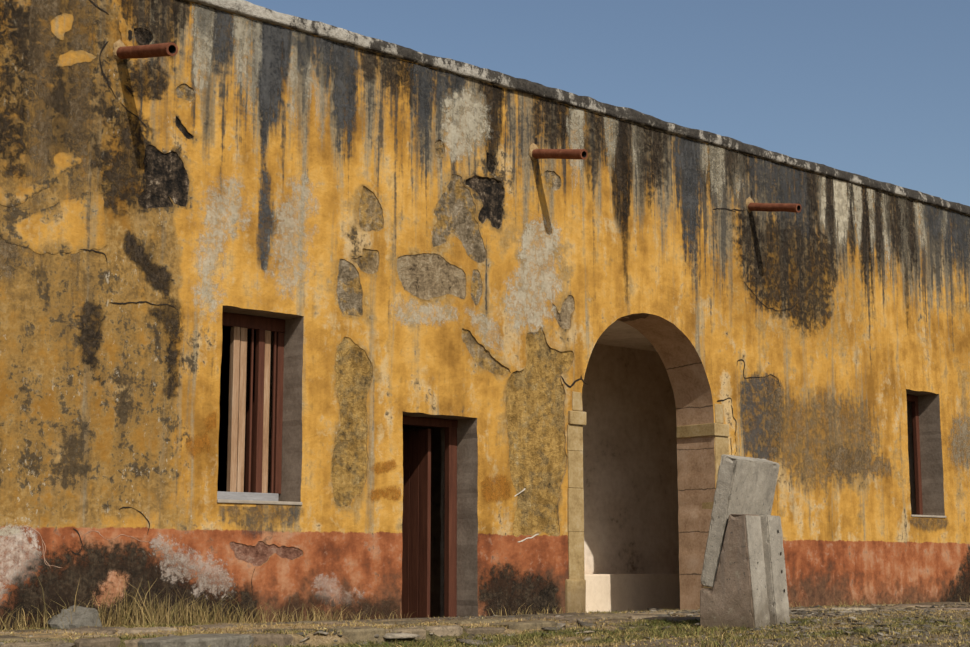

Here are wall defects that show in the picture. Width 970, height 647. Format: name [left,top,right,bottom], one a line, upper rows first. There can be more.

damp [92,107,153,215]
damp [123,231,184,397]
spalling [138,145,189,209]
damp [121,0,504,312]
spalling [336,248,379,317]
spalling [397,152,505,305]
damp [533,98,970,332]
spalling [331,337,373,507]
spalling [461,327,574,537]
damp [740,374,891,493]
damp [0,526,259,630]
spalling [229,541,303,566]